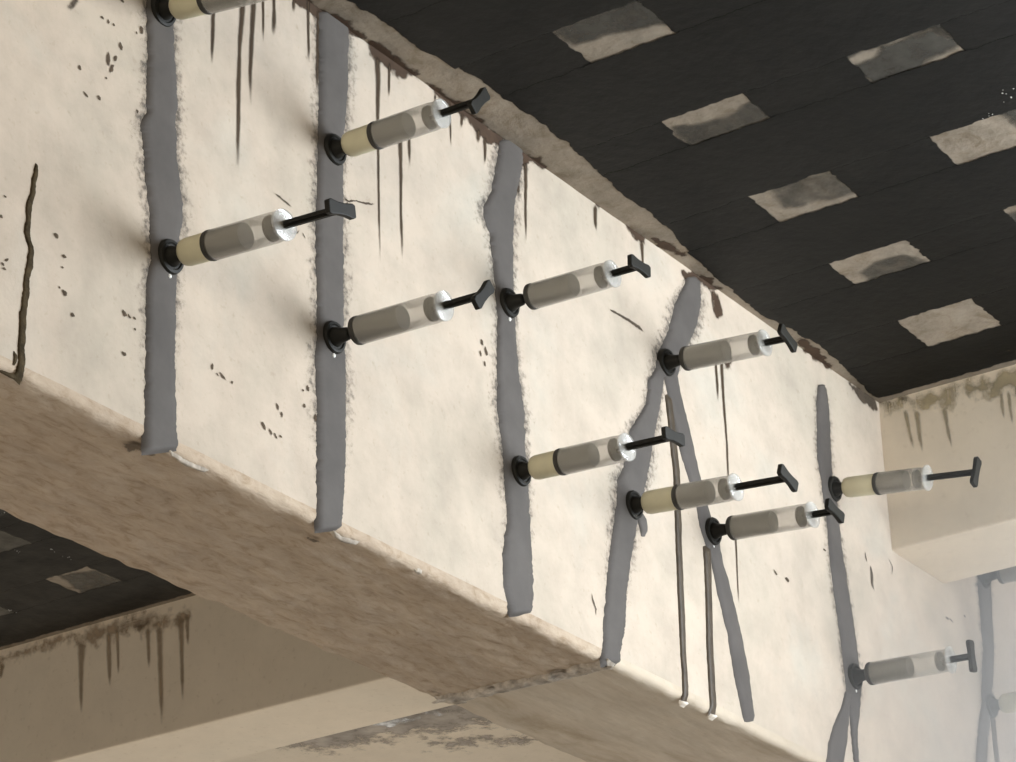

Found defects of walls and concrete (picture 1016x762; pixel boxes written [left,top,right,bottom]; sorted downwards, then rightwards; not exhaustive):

corrosion [237,0,276,153]
corrosion [292,0,503,160]
corrosion [398,140,411,247]
corrosion [517,152,547,233]
crack [0,163,38,385]
corrosion [626,225,686,263]
corrosion [681,270,723,318]
corrosion [798,339,832,369]
corrosion [715,355,732,476]
damp [849,371,1016,446]
damp [16,612,189,708]